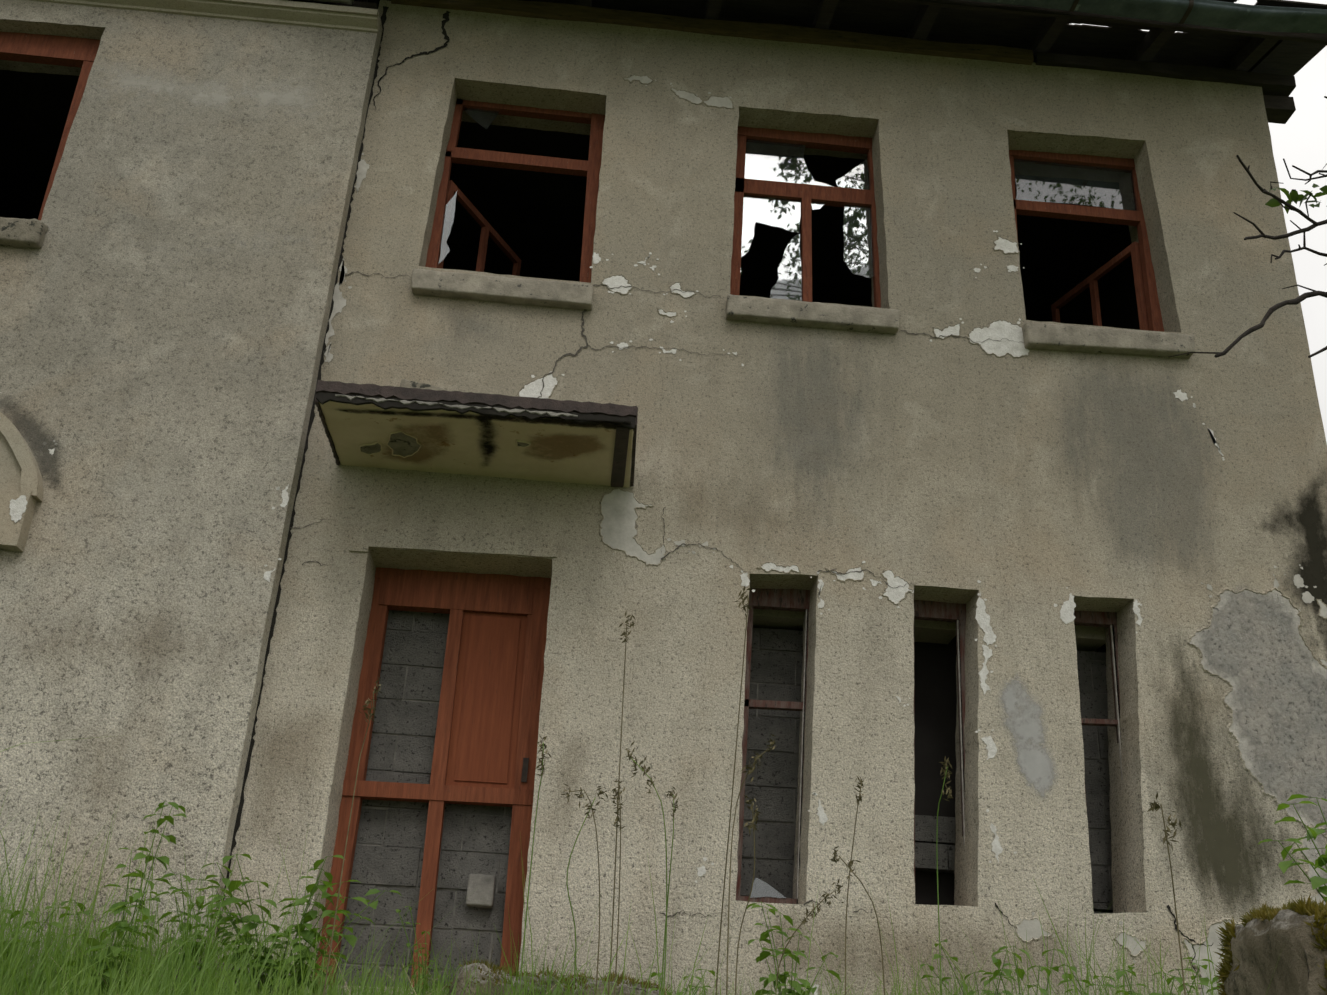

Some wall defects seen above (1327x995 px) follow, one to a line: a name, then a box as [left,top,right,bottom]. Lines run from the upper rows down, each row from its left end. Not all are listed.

peeling [993,230,1024,272]
crack [515,274,744,399]
damp [339,410,632,460]
crack [214,6,450,948]
crack [729,561,917,608]
peeling [818,579,830,615]
peeling [975,580,997,694]
peeling [975,729,997,760]
peeling [1187,564,1327,905]
peeling [986,809,1017,863]
peeling [1181,917,1242,995]